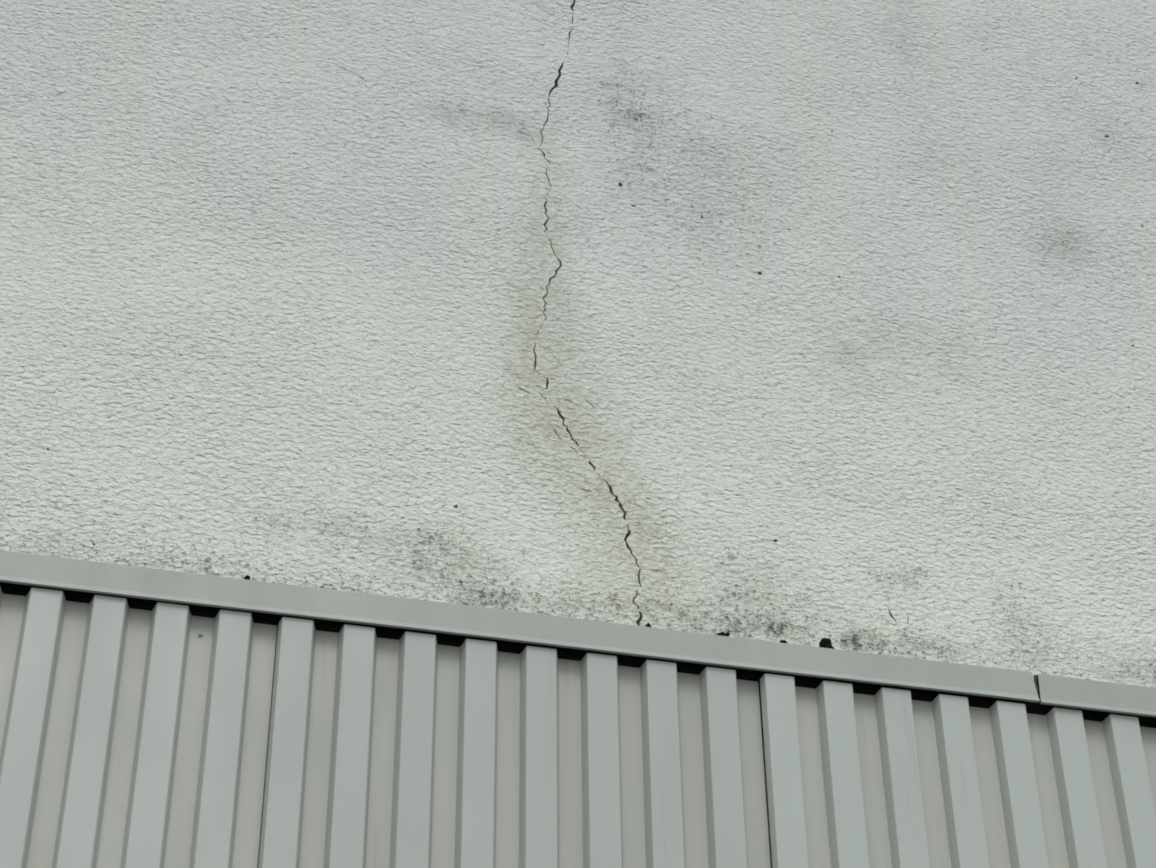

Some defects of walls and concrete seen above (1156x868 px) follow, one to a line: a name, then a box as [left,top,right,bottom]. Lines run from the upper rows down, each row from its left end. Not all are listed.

leakage [38,491,959,662]
crack [515,0,658,626]